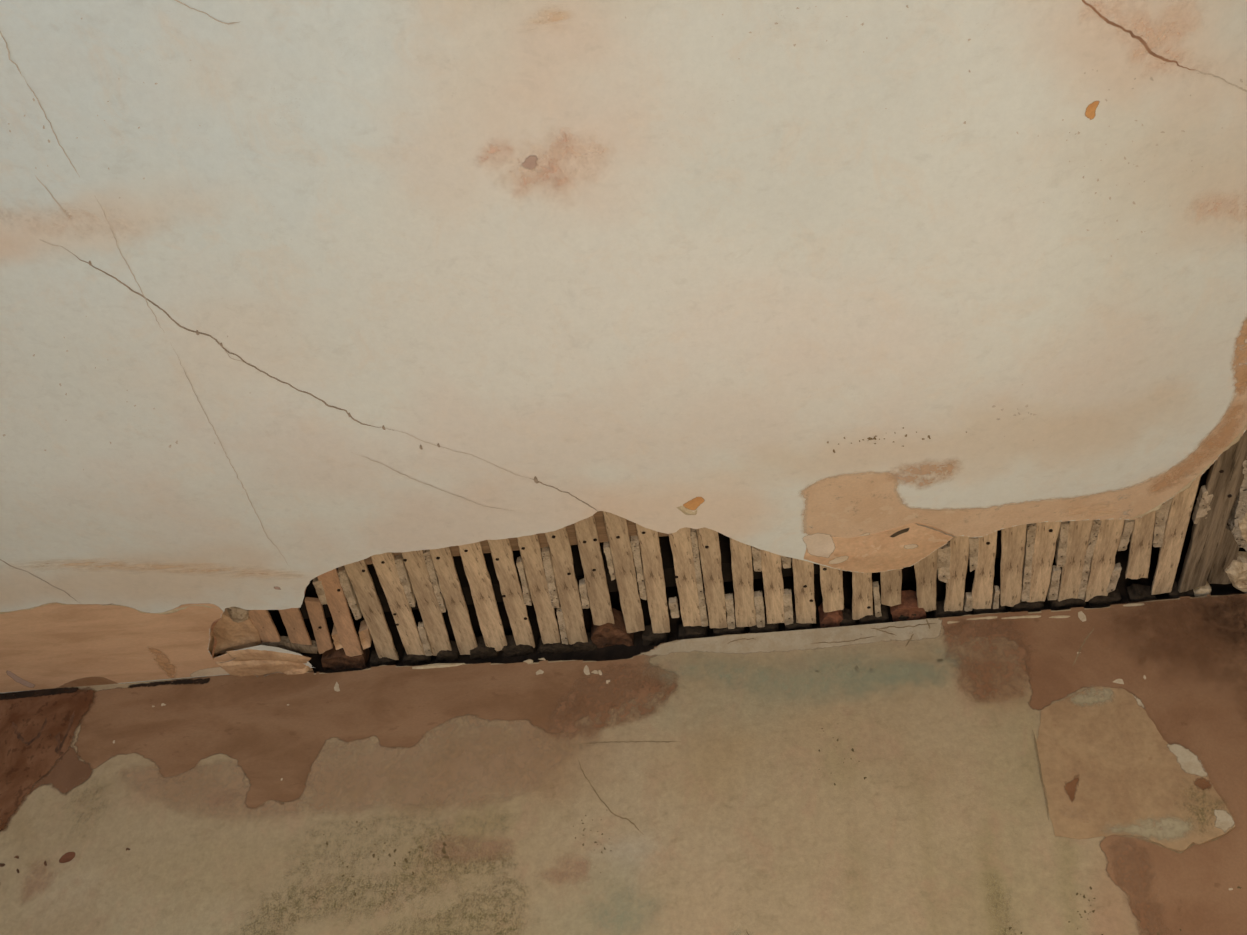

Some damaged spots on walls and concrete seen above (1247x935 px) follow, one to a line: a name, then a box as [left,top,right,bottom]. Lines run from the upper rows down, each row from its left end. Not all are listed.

crack [175,0,239,25]
crack [1082,0,1247,92]
crack [0,31,600,571]
peeling [0,319,1247,935]
leakage [243,832,506,935]